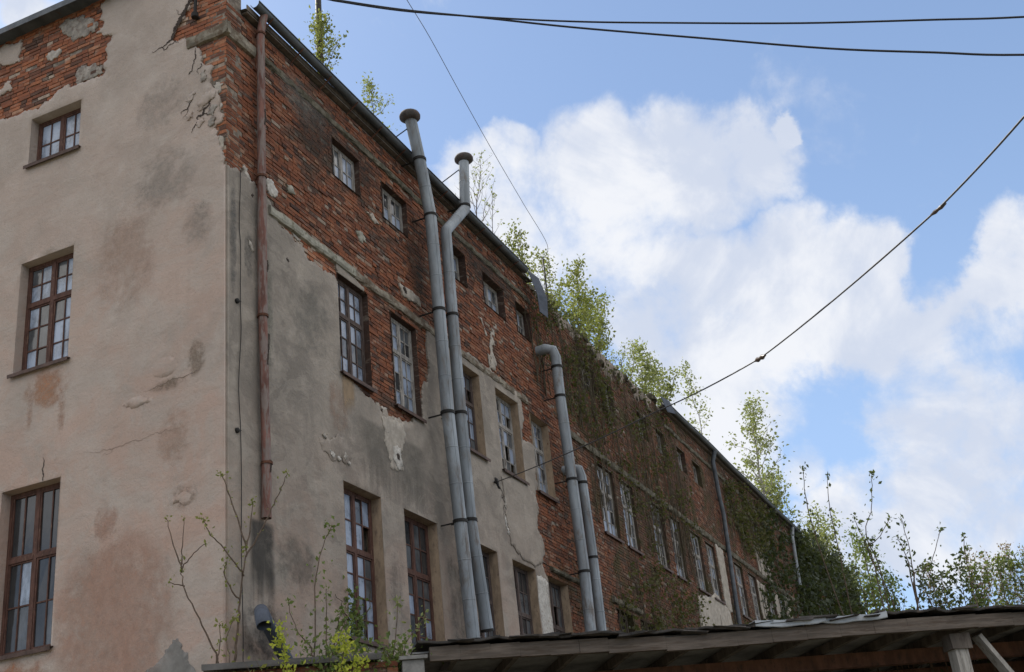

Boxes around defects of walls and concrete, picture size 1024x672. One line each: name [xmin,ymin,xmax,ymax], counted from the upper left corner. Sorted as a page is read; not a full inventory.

spalling [0,0,112,119]
crack [153,0,202,74]
crack [182,100,215,131]
spalling [344,283,428,472]
damp [252,520,273,589]